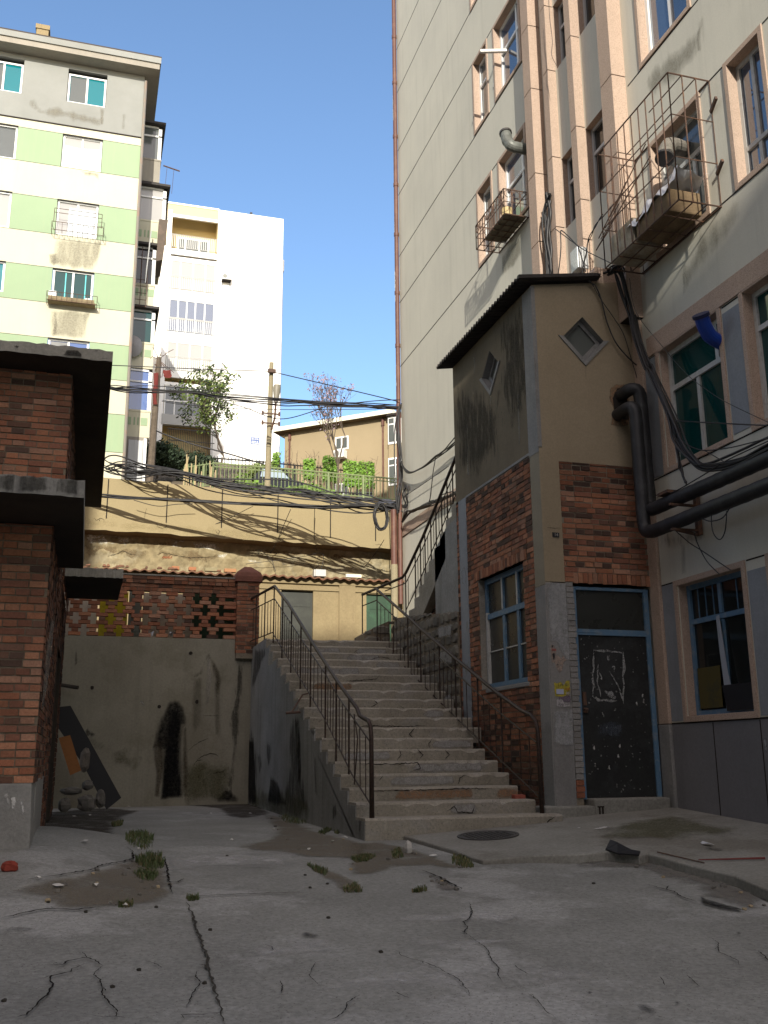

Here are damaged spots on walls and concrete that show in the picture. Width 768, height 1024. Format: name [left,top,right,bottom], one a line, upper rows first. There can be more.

water stain [155,702,187,798]
water stain [248,721,307,816]
crack [20,952,121,1017]
crack [181,972,219,1018]
crack [423,870,554,1016]